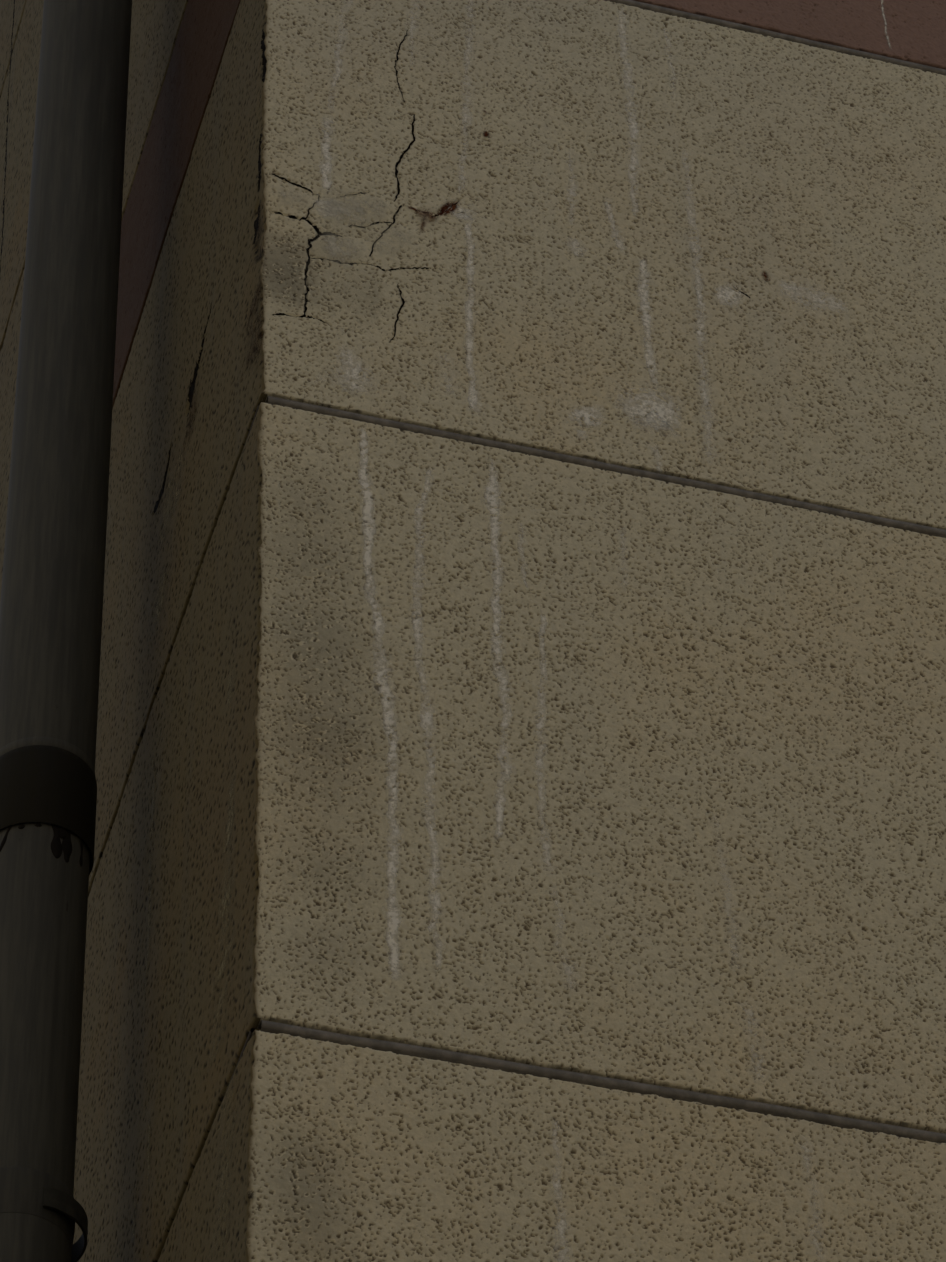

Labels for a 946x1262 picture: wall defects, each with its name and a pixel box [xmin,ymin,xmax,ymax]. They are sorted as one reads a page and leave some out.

crack [253,29,433,342]
crack [153,443,172,513]
water stain [359,430,401,978]
water stain [412,471,442,965]
water stain [485,467,512,728]